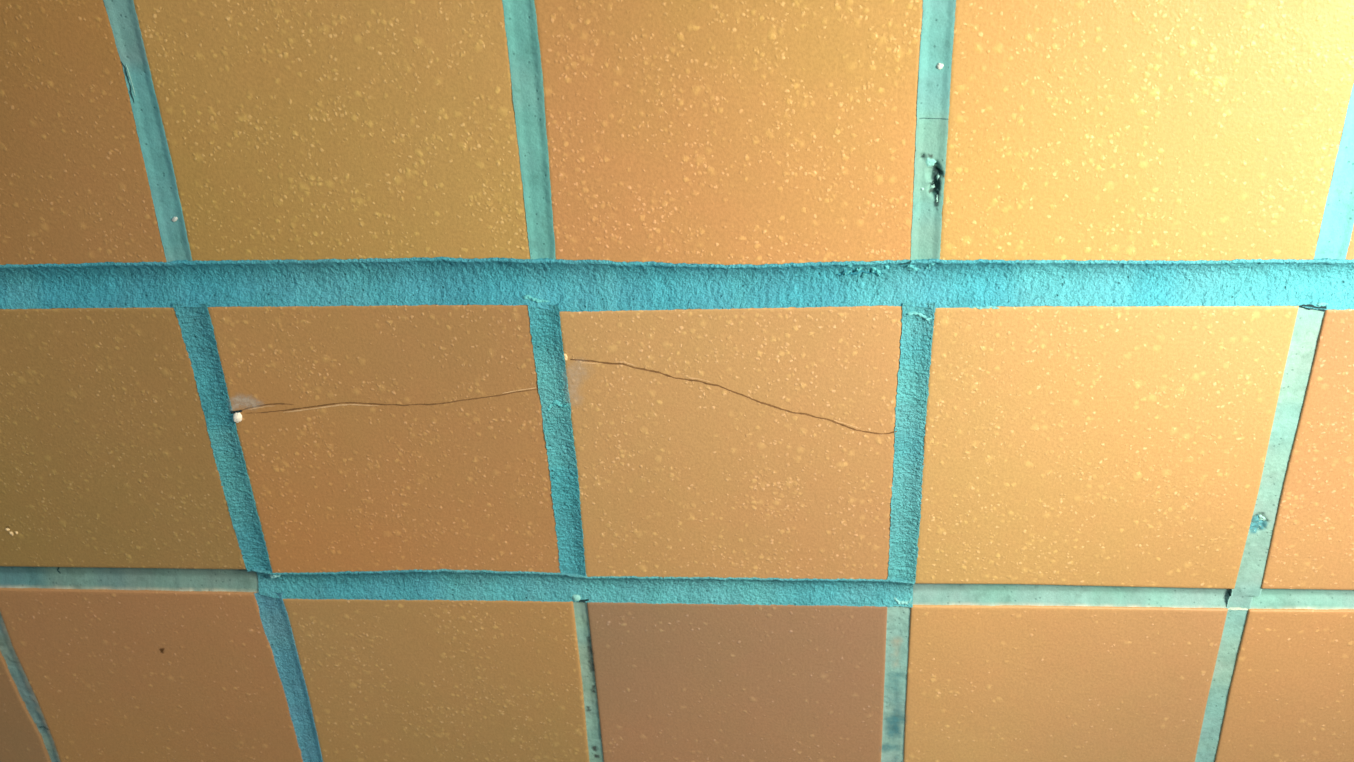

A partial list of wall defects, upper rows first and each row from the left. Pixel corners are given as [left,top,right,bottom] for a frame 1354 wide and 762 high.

crack [232,388,540,413]
crack [570,359,897,434]